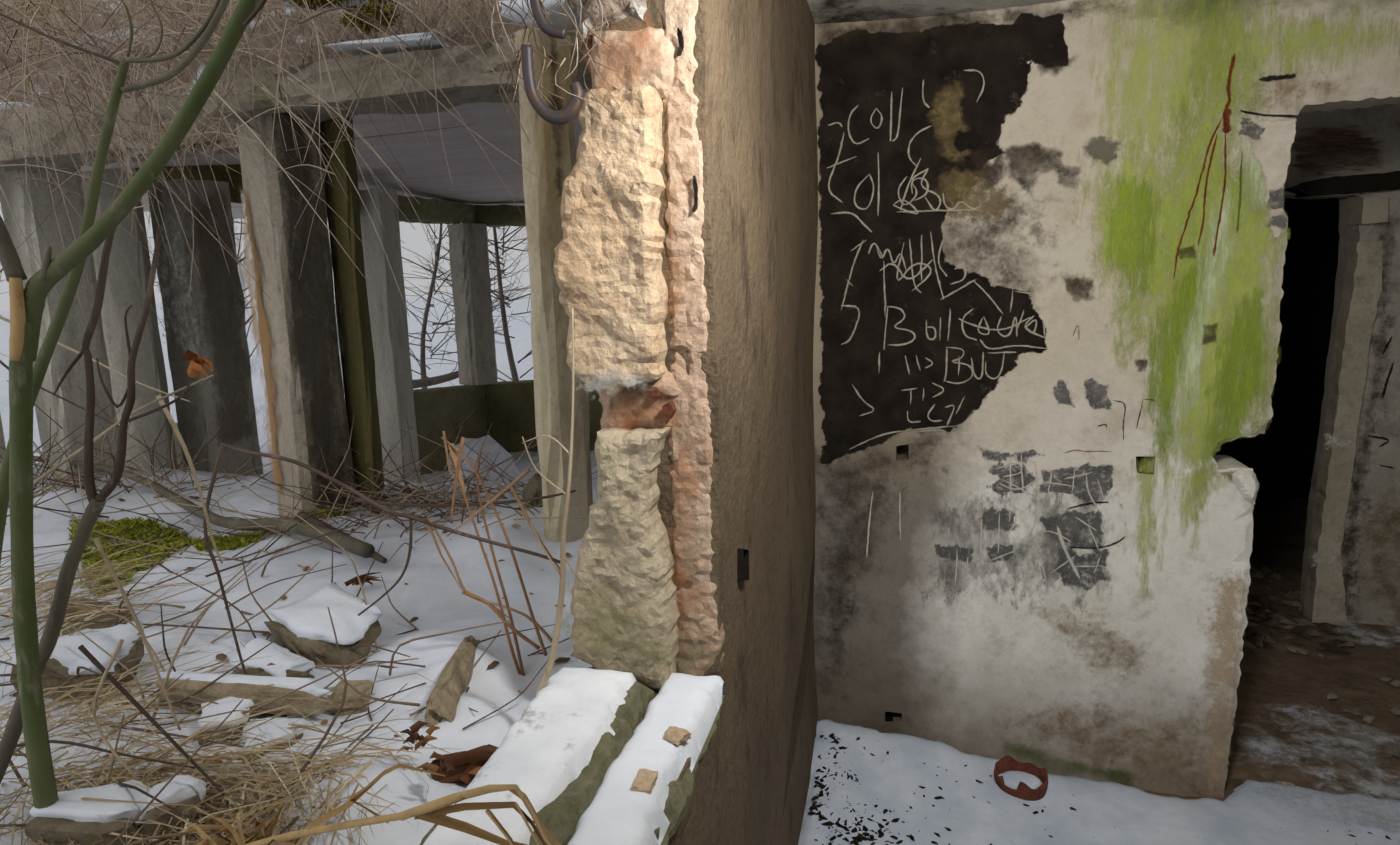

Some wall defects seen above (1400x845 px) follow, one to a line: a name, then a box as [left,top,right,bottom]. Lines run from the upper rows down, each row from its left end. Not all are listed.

damp [1084,136,1119,165]
corrosion [1174,54,1242,277]
spalling [553,27,681,690]
peeling [815,8,1078,643]
peeling [1066,278,1092,298]
damp [1136,208,1266,593]
peeling [923,446,1126,611]